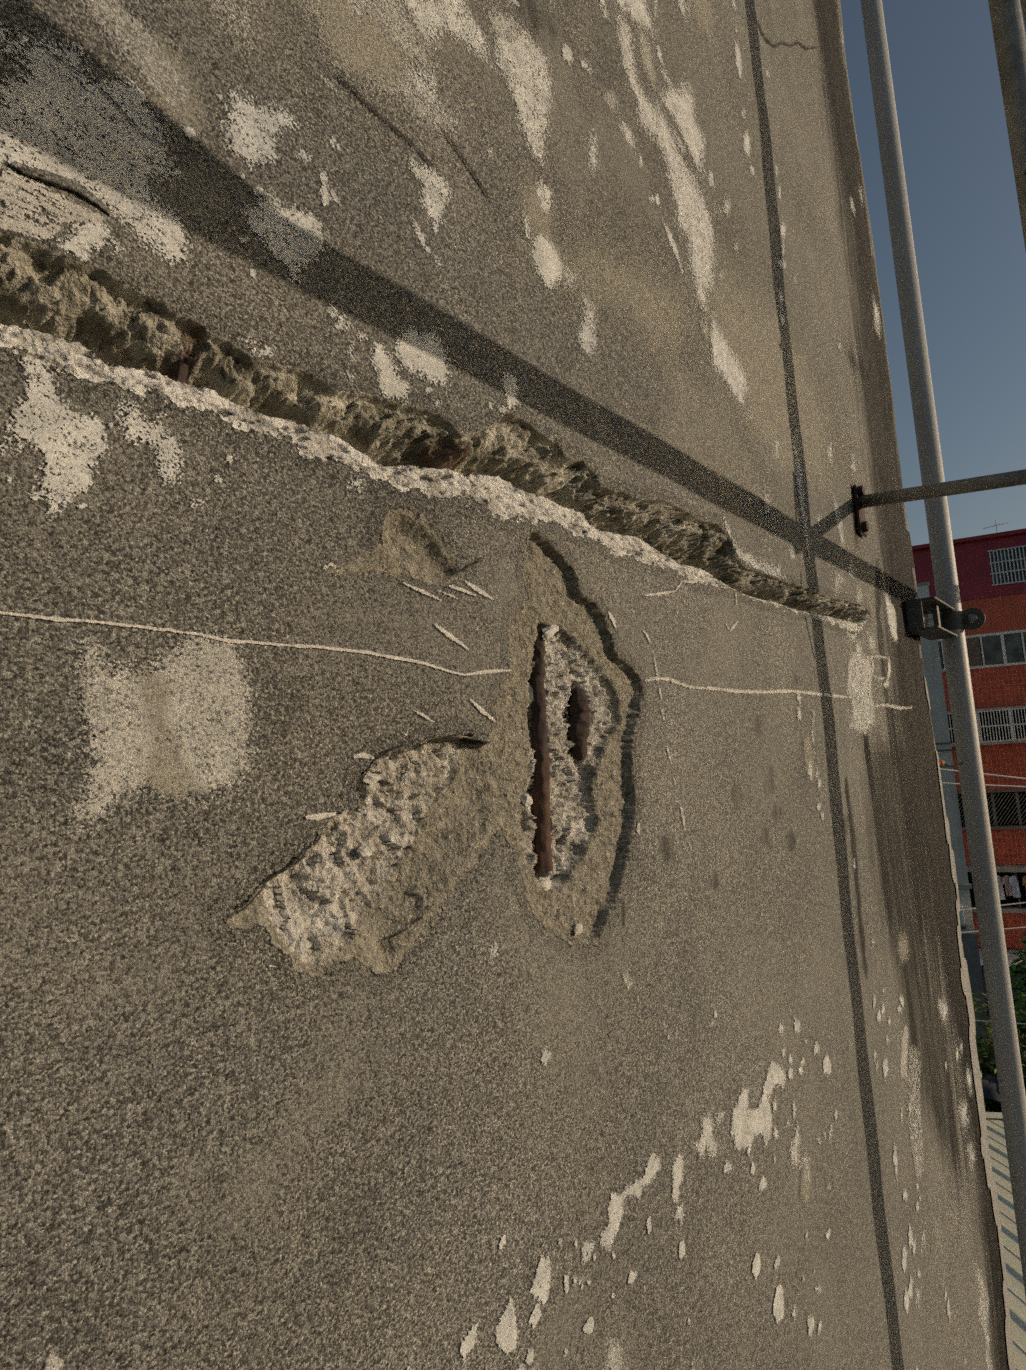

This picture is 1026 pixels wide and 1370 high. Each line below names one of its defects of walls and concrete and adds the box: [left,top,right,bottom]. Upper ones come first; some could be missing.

leakage [81,0,207,132]
leakage [209,0,264,54]
leakage [300,0,462,142]
crack [0,208,871,640]
leakage [559,234,839,521]
efflorescence [603,1338,628,1370]